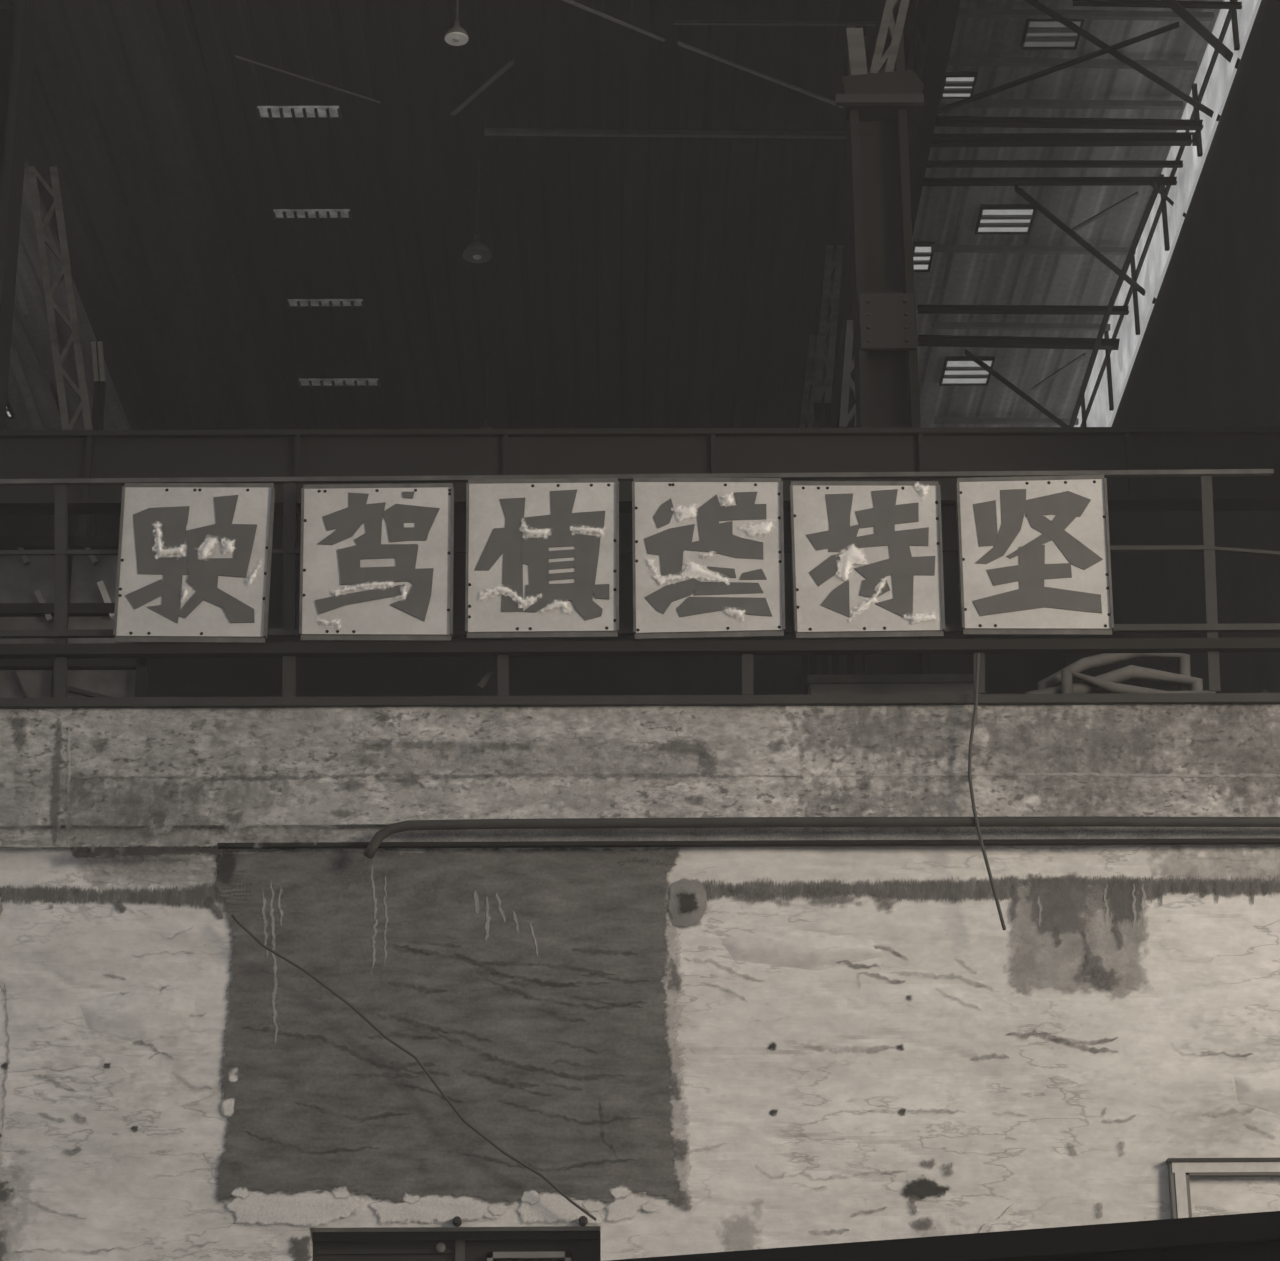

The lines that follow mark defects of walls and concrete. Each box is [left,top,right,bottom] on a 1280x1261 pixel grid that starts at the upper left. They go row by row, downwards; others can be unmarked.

crack [839,946,908,983]
crack [2,985,10,1091]
crack [971,1031,1118,1060]
peeling [227,913,691,1227]
peeling [222,1098,234,1116]